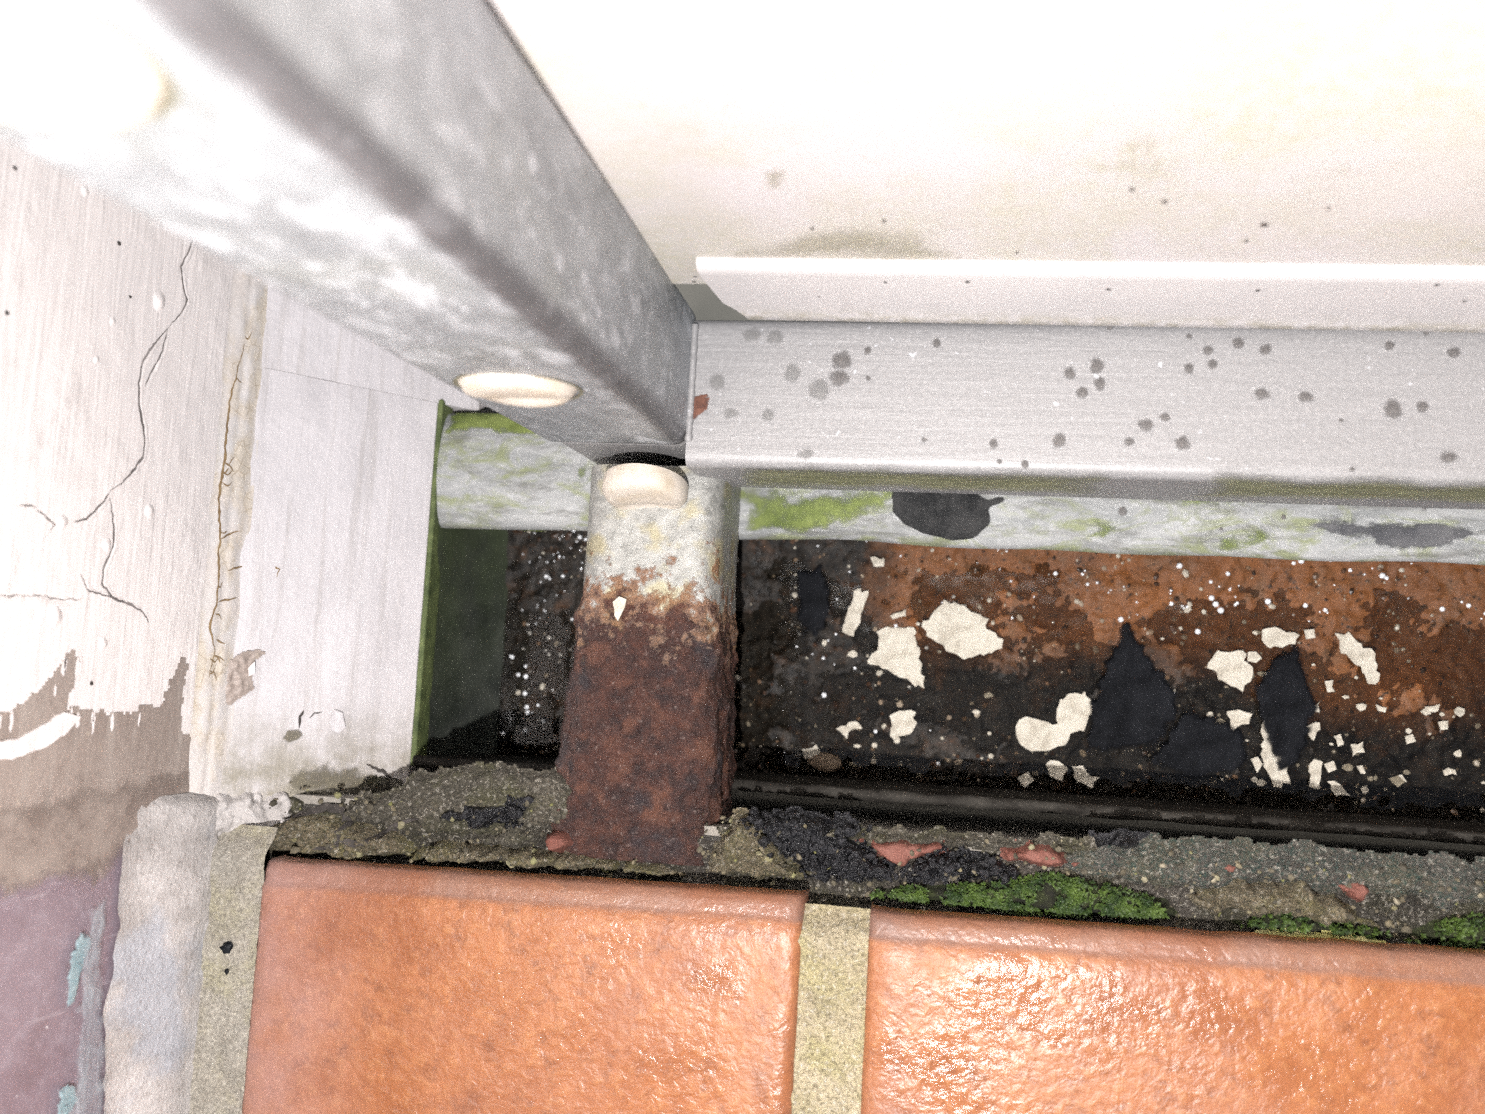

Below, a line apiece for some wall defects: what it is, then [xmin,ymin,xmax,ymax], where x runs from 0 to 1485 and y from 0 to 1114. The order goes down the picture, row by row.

crack [0,242,195,621]
peeling [842,588,1003,688]
peeling [1207,627,1299,692]
peeling [1335,632,1383,711]
peeling [0,650,191,816]
peeling [837,710,917,748]
peeling [1016,691,1100,788]
peeling [1207,710,1322,789]
peeling [1341,763,1410,794]
peeling [1420,707,1465,717]